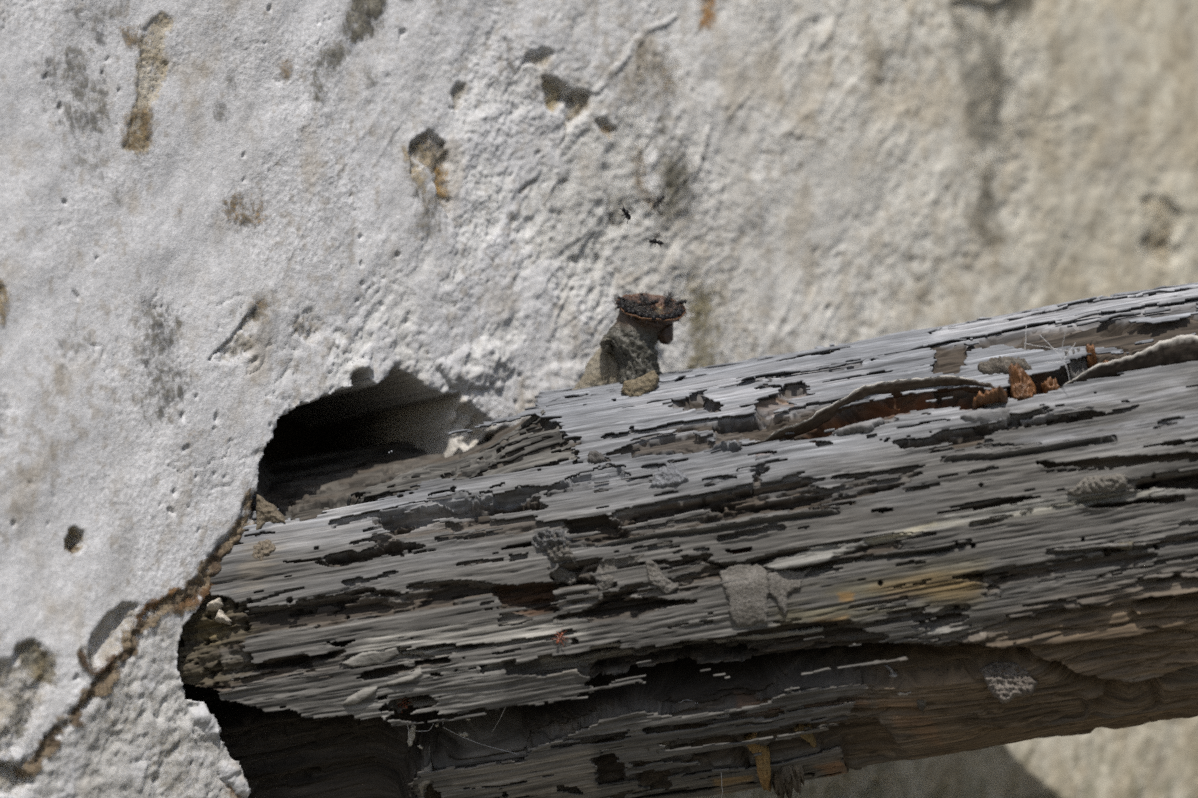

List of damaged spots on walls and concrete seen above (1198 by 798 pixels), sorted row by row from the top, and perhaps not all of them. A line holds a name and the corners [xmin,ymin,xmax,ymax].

spalling [119,11,173,154]
spalling [401,134,449,211]
spalling [0,280,9,325]
flaking render [0,604,244,798]
crack [12,487,255,778]
spalling [206,598,232,625]